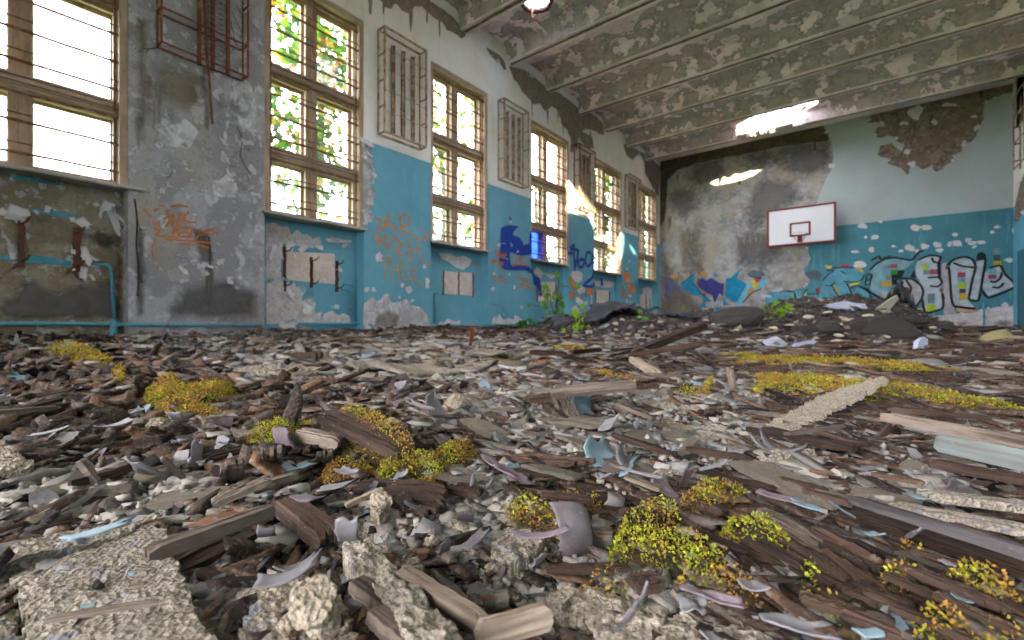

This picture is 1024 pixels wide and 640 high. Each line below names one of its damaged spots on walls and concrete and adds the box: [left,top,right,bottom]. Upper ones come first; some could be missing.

peeling [231,80,257,137]
peeling [164,119,199,149]
spalling [445,0,1024,313]
peeling [212,176,238,199]
peeling [360,136,377,225]
peeling [0,191,125,236]
peeling [0,246,99,281]
peeling [166,262,252,292]
peeling [265,222,487,361]